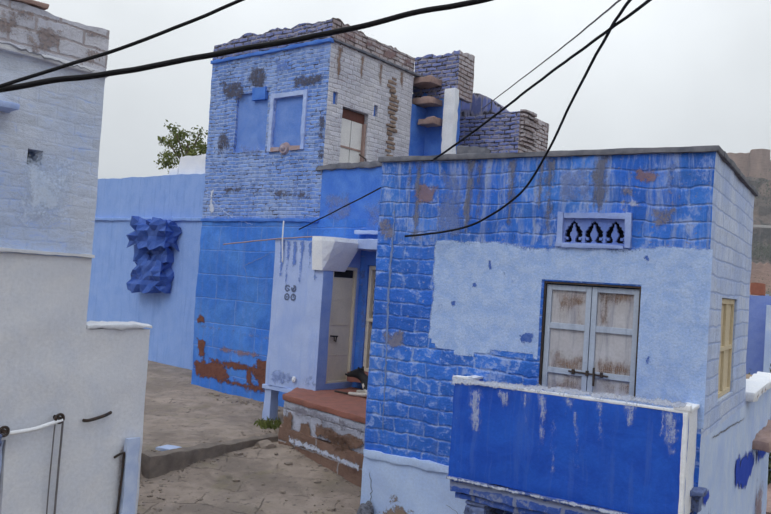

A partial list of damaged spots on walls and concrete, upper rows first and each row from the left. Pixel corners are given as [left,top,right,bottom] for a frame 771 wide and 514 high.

flaking render [385,77,399,156]
leakage [280,241,312,282]
flaking render [194,338,267,393]
peeling [281,406,363,451]